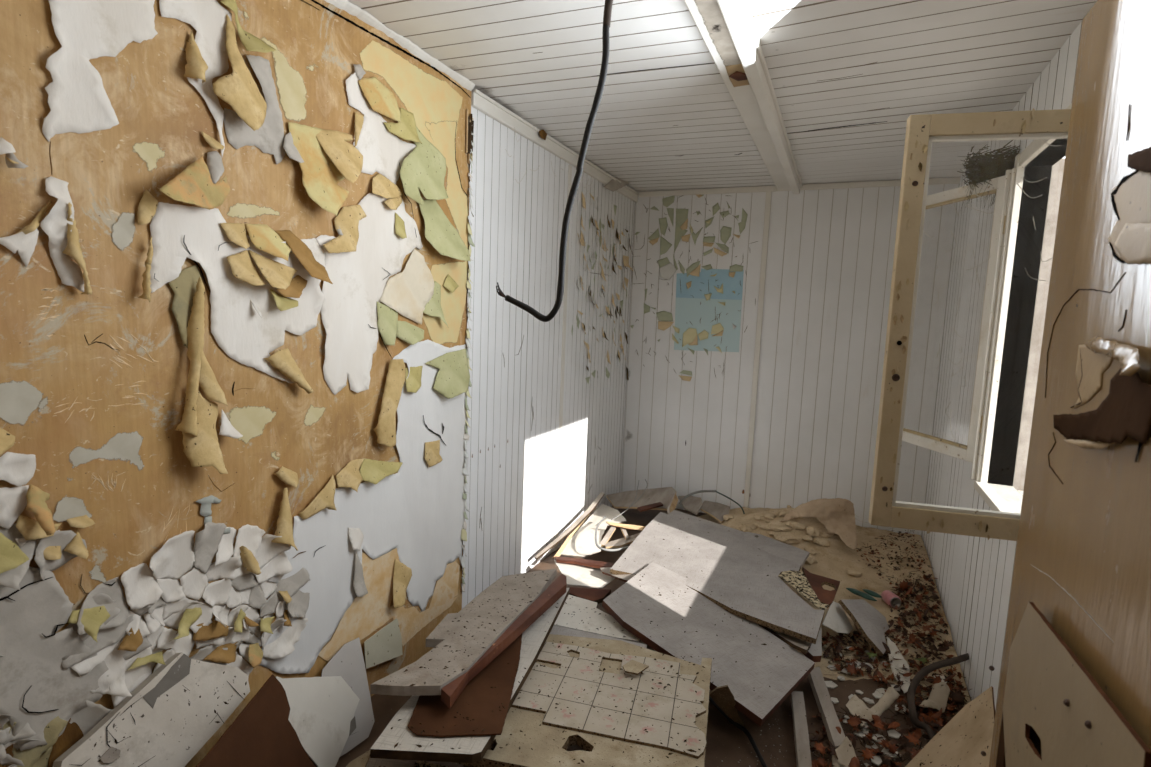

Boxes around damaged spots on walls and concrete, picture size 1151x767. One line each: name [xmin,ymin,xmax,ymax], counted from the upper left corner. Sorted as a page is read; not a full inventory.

peeling [571,193,748,384]
peeling [1108,147,1151,265]
peeling [1053,336,1151,462]
peeling [0,495,310,767]